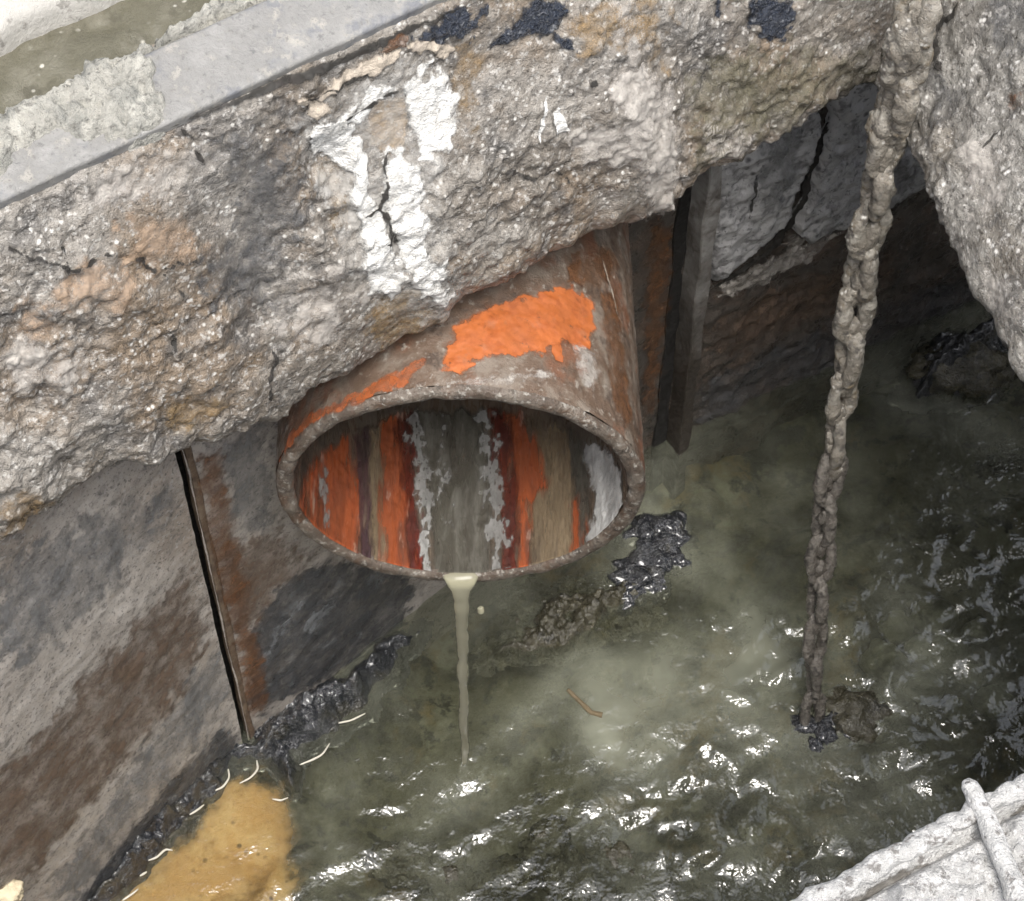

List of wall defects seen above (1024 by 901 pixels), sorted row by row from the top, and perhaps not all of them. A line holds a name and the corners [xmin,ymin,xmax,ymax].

water stain [296,59,461,307]
crack [365,152,398,264]
crack [716,117,829,287]
efflorescence [274,296,337,346]
peeling [552,342,563,362]
corrosion [393,411,424,570]
corrosion [488,409,520,570]
corrosion [196,454,305,709]